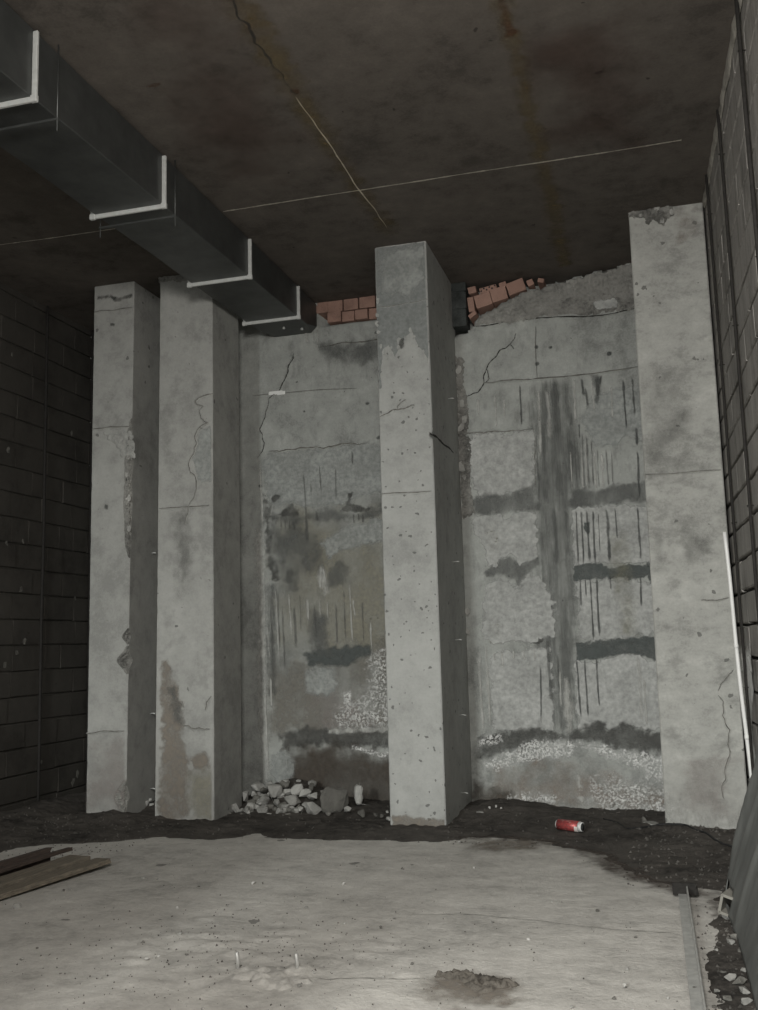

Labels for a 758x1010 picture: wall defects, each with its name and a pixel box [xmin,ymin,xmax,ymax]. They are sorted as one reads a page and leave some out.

crack [232,0,386,226]
spalling [103,418,135,558]
crack [159,392,213,525]
crack [253,353,366,457]
crack [429,308,638,489]
spalling [117,628,133,674]
damp [468,377,739,829]
damp [739,643,756,763]